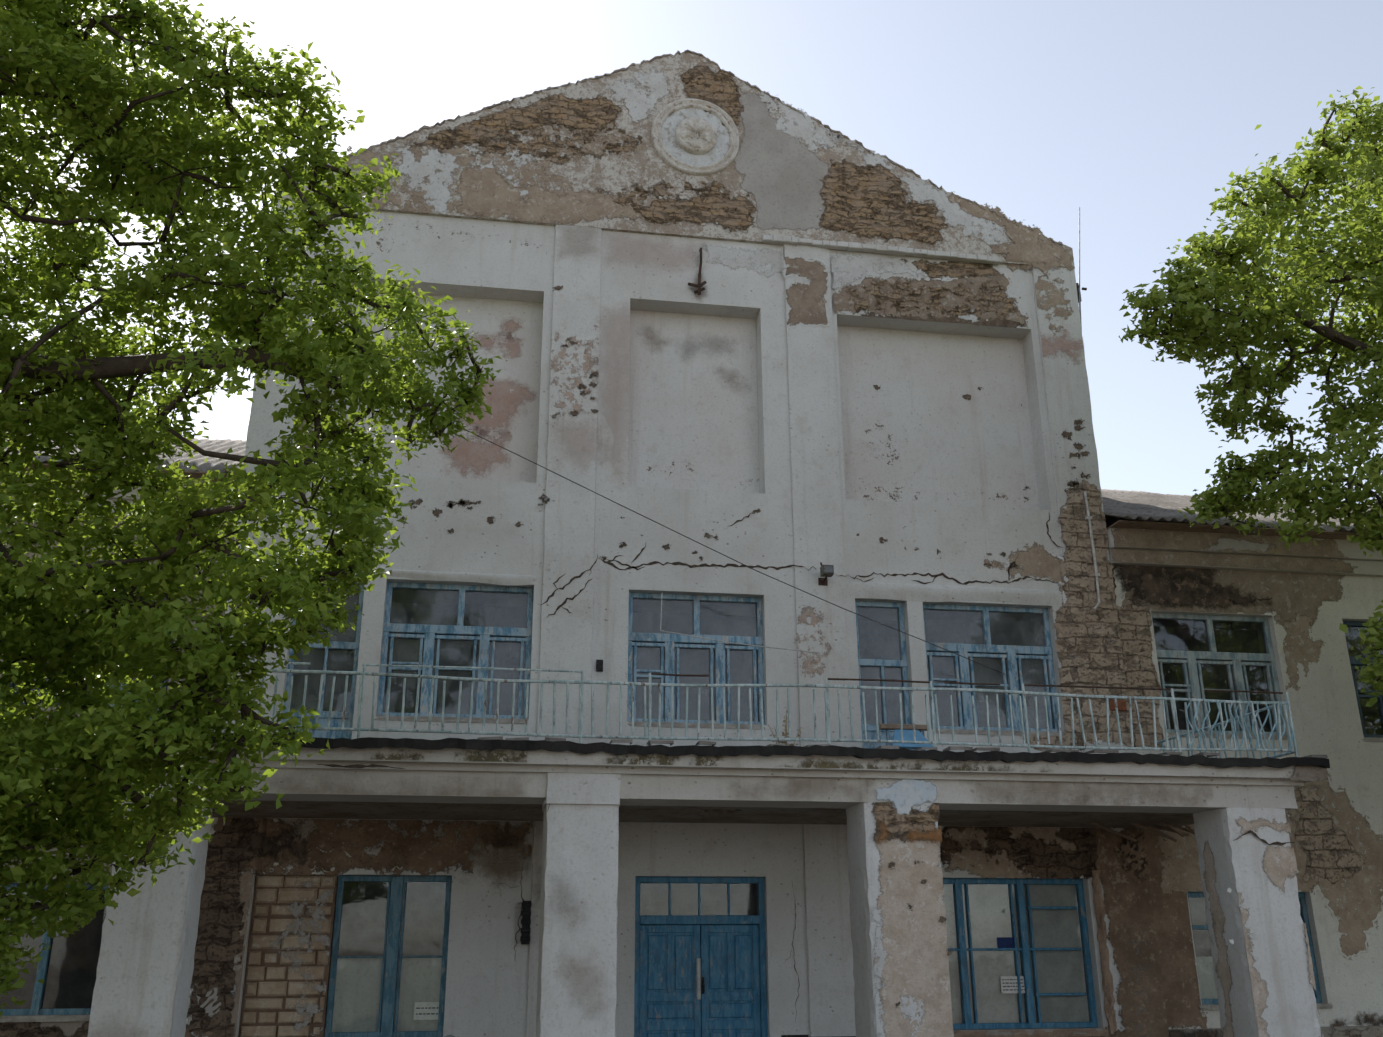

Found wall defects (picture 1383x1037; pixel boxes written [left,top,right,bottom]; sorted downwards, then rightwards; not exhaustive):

peeling [343,60,1084,361]
crack [541,545,1065,616]
crack [1046,515,1063,548]
flaking render [983,420,1358,751]
peeling [185,817,533,1037]
peeling [871,779,1269,1037]
flaking render [1235,765,1383,960]
flaking render [0,1021,89,1037]
spalling [1321,1013,1383,1037]